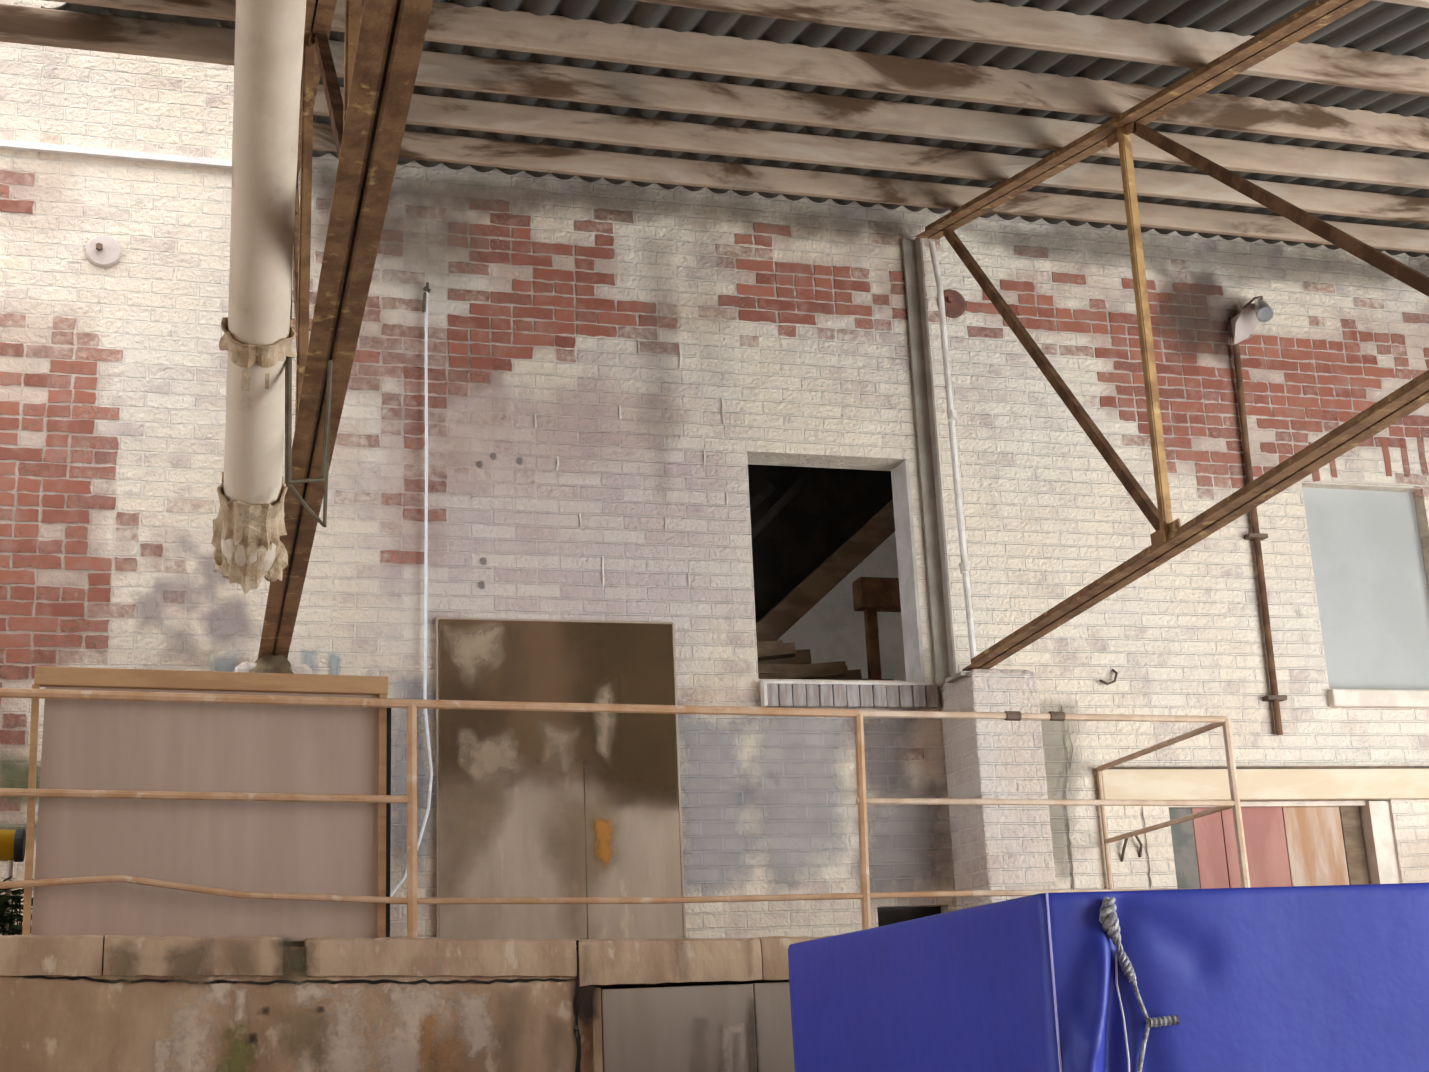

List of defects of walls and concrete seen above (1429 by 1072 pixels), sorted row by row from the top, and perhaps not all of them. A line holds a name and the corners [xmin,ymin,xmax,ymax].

peeling [351,201,679,450]
leakage [390,183,680,215]
peeling [718,223,907,337]
leakage [783,214,892,236]
leakage [1006,235,1388,354]
peeling [966,250,1429,489]
peeling [0,322,163,744]
peeling [380,550,425,564]
peeling [386,479,447,522]
crack [11,940,581,1072]